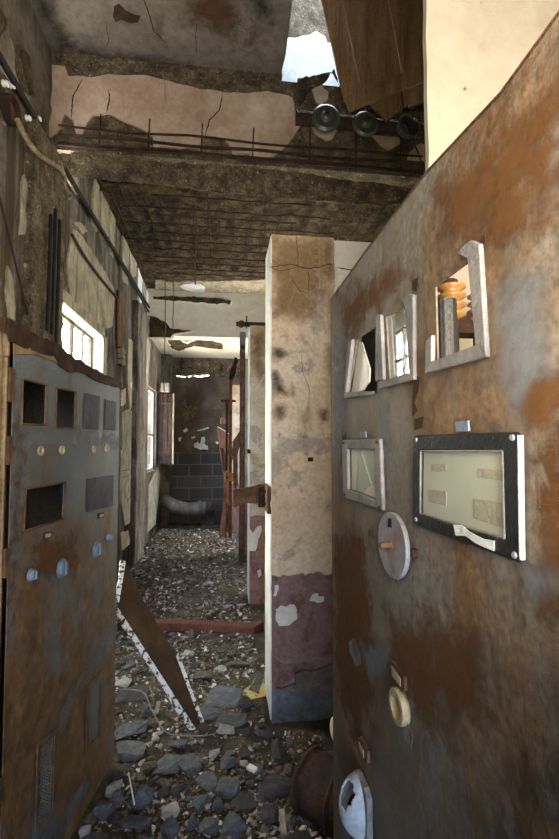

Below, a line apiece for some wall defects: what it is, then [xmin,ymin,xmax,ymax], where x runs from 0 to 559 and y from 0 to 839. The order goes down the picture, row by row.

peeling [113,4,140,23]
spalling [49,31,424,401]
peeling [178,427,219,450]
peeling [247,526,262,551]
peeling [275,604,297,626]